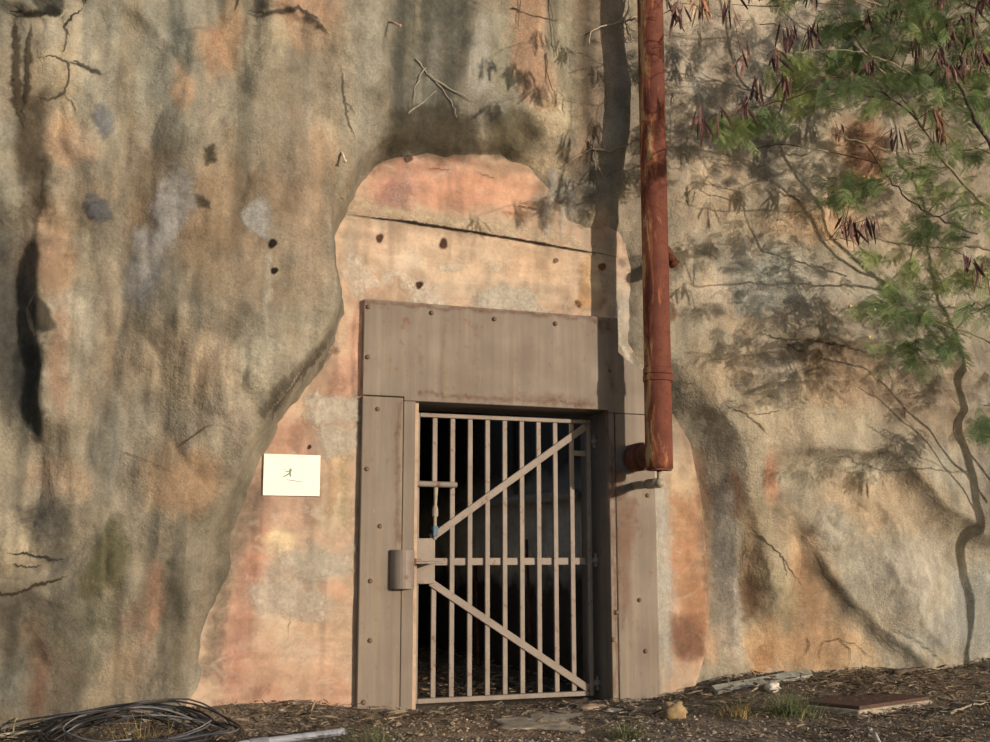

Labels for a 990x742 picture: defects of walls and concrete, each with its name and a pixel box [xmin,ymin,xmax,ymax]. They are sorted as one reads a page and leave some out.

crack [234,0,330,35]
crack [9,0,101,130]
leakage [387,0,502,160]
leakage [20,101,48,209]
crack [348,214,615,257]
crack [762,334,873,355]
crack [0,552,70,596]
crack [740,524,804,588]
crack [806,638,871,664]